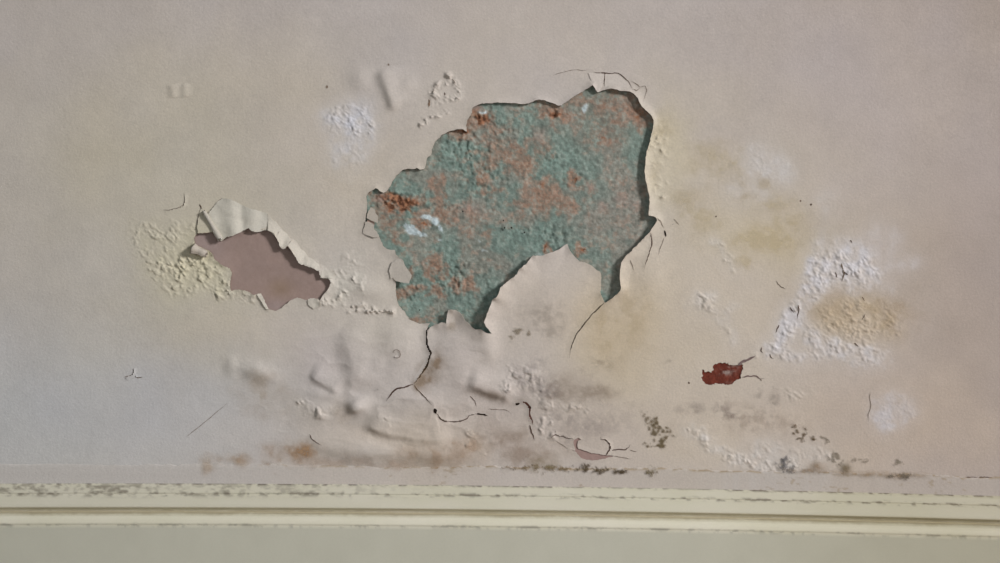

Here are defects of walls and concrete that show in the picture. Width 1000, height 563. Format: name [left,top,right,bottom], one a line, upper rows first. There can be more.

crack [555,69,647,95]
leakage [311,90,389,187]
peeling [117,64,682,465]
leakage [679,134,933,446]
crack [565,301,604,357]
crack [386,325,576,447]
leakage [524,464,627,475]
crack [601,435,636,459]
leakage [646,413,856,473]